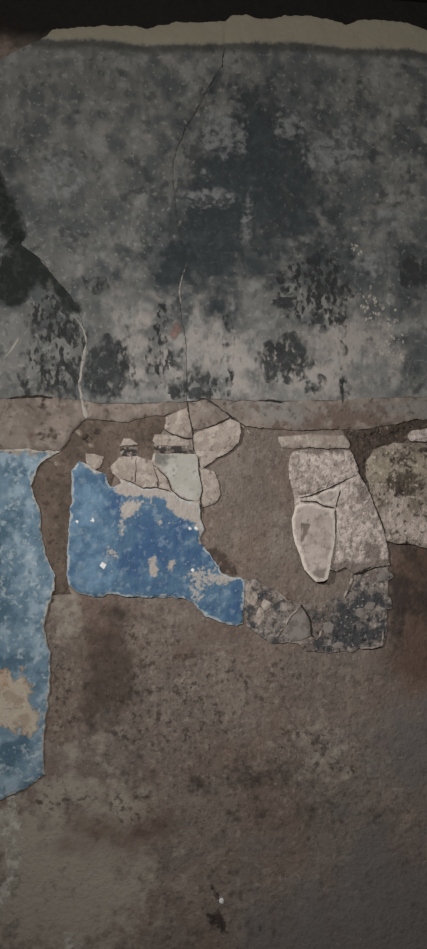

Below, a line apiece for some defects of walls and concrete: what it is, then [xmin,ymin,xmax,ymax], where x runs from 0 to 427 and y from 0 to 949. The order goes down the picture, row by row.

water stain [203,111,244,158]
water stain [275,111,304,137]
water stain [302,125,363,172]
water stain [188,189,234,206]
water stain [0,176,138,398]
crack [121,48,238,517]
mould [272,253,357,329]
water stain [146,304,234,403]
mould [258,331,326,393]
spalling [0,415,427,833]